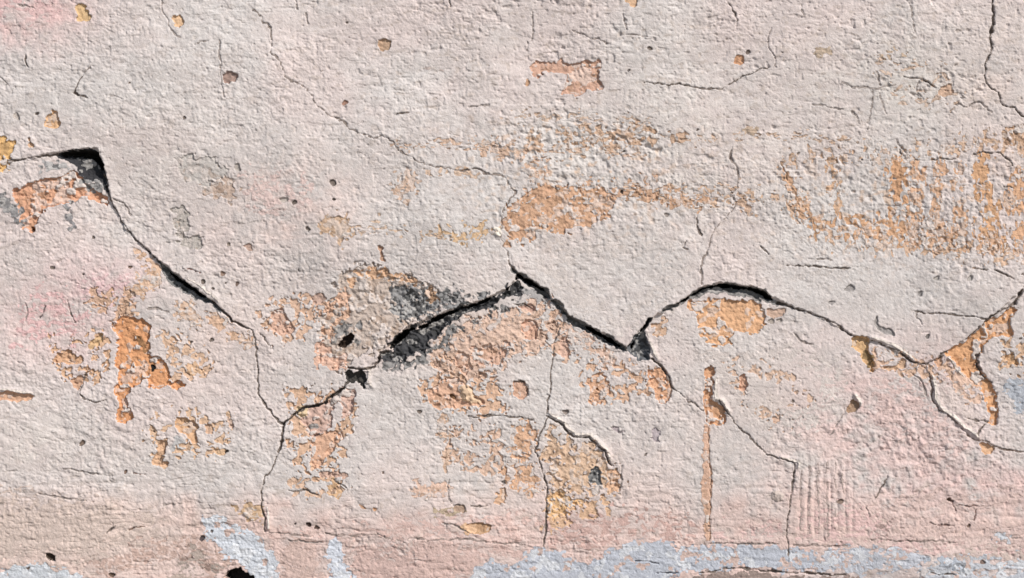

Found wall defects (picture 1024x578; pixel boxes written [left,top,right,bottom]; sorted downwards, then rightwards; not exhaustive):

crack [956,0,1024,117]
spalling [0,160,109,233]
crack [8,9,854,546]
peeling [48,52,1024,532]
crack [871,268,1024,452]
crack [896,139,1013,188]
crack [700,401,846,576]
crack [866,478,976,543]